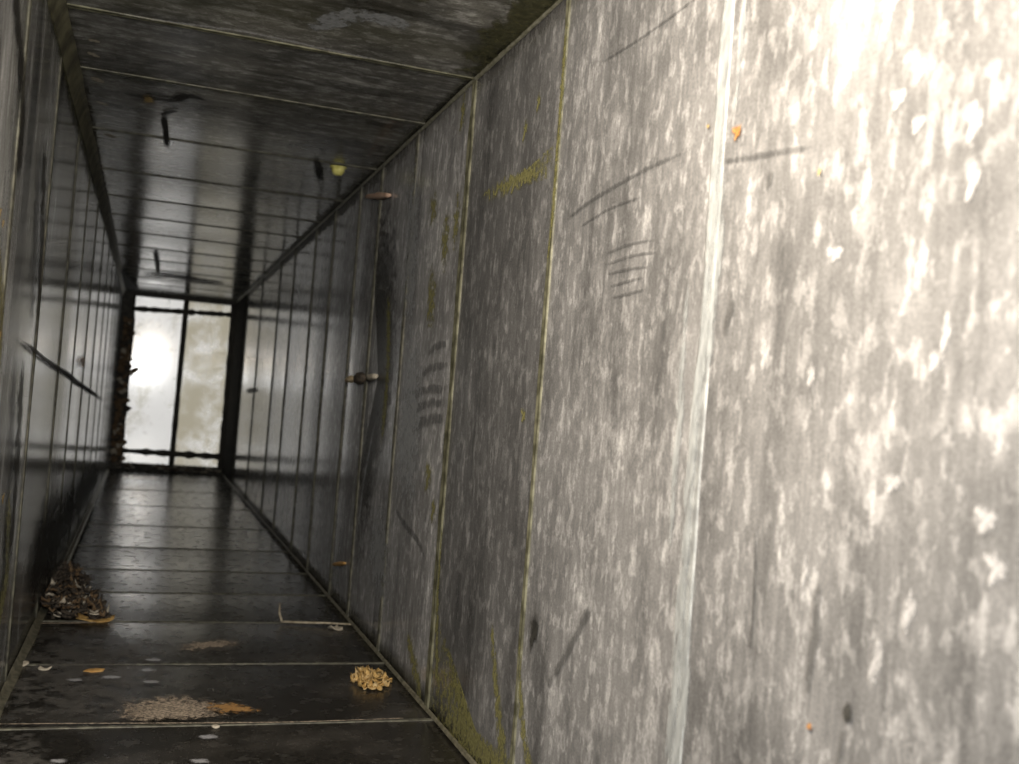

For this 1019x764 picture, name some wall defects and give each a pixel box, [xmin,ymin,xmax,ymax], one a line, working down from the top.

water stain [518,620,538,764]
water stain [666,0,747,764]